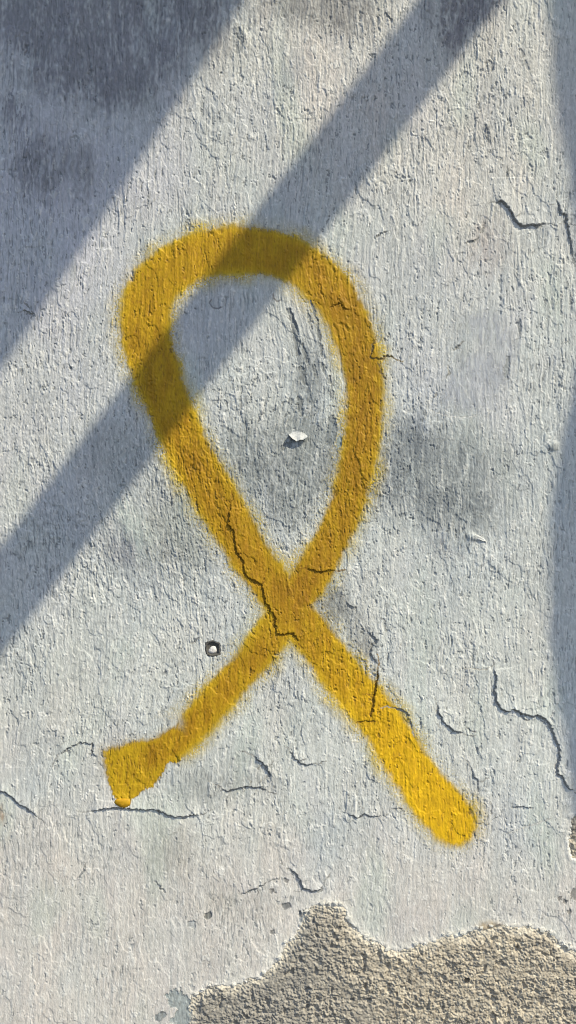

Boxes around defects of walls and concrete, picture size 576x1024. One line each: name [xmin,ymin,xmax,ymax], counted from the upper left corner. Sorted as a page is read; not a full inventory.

crack [490,166,576,267]
crack [217,490,304,649]
crack [82,746,327,819]
crack [434,697,532,814]
crack [462,657,576,794]
crack [241,860,330,895]
spalling [155,900,576,1024]